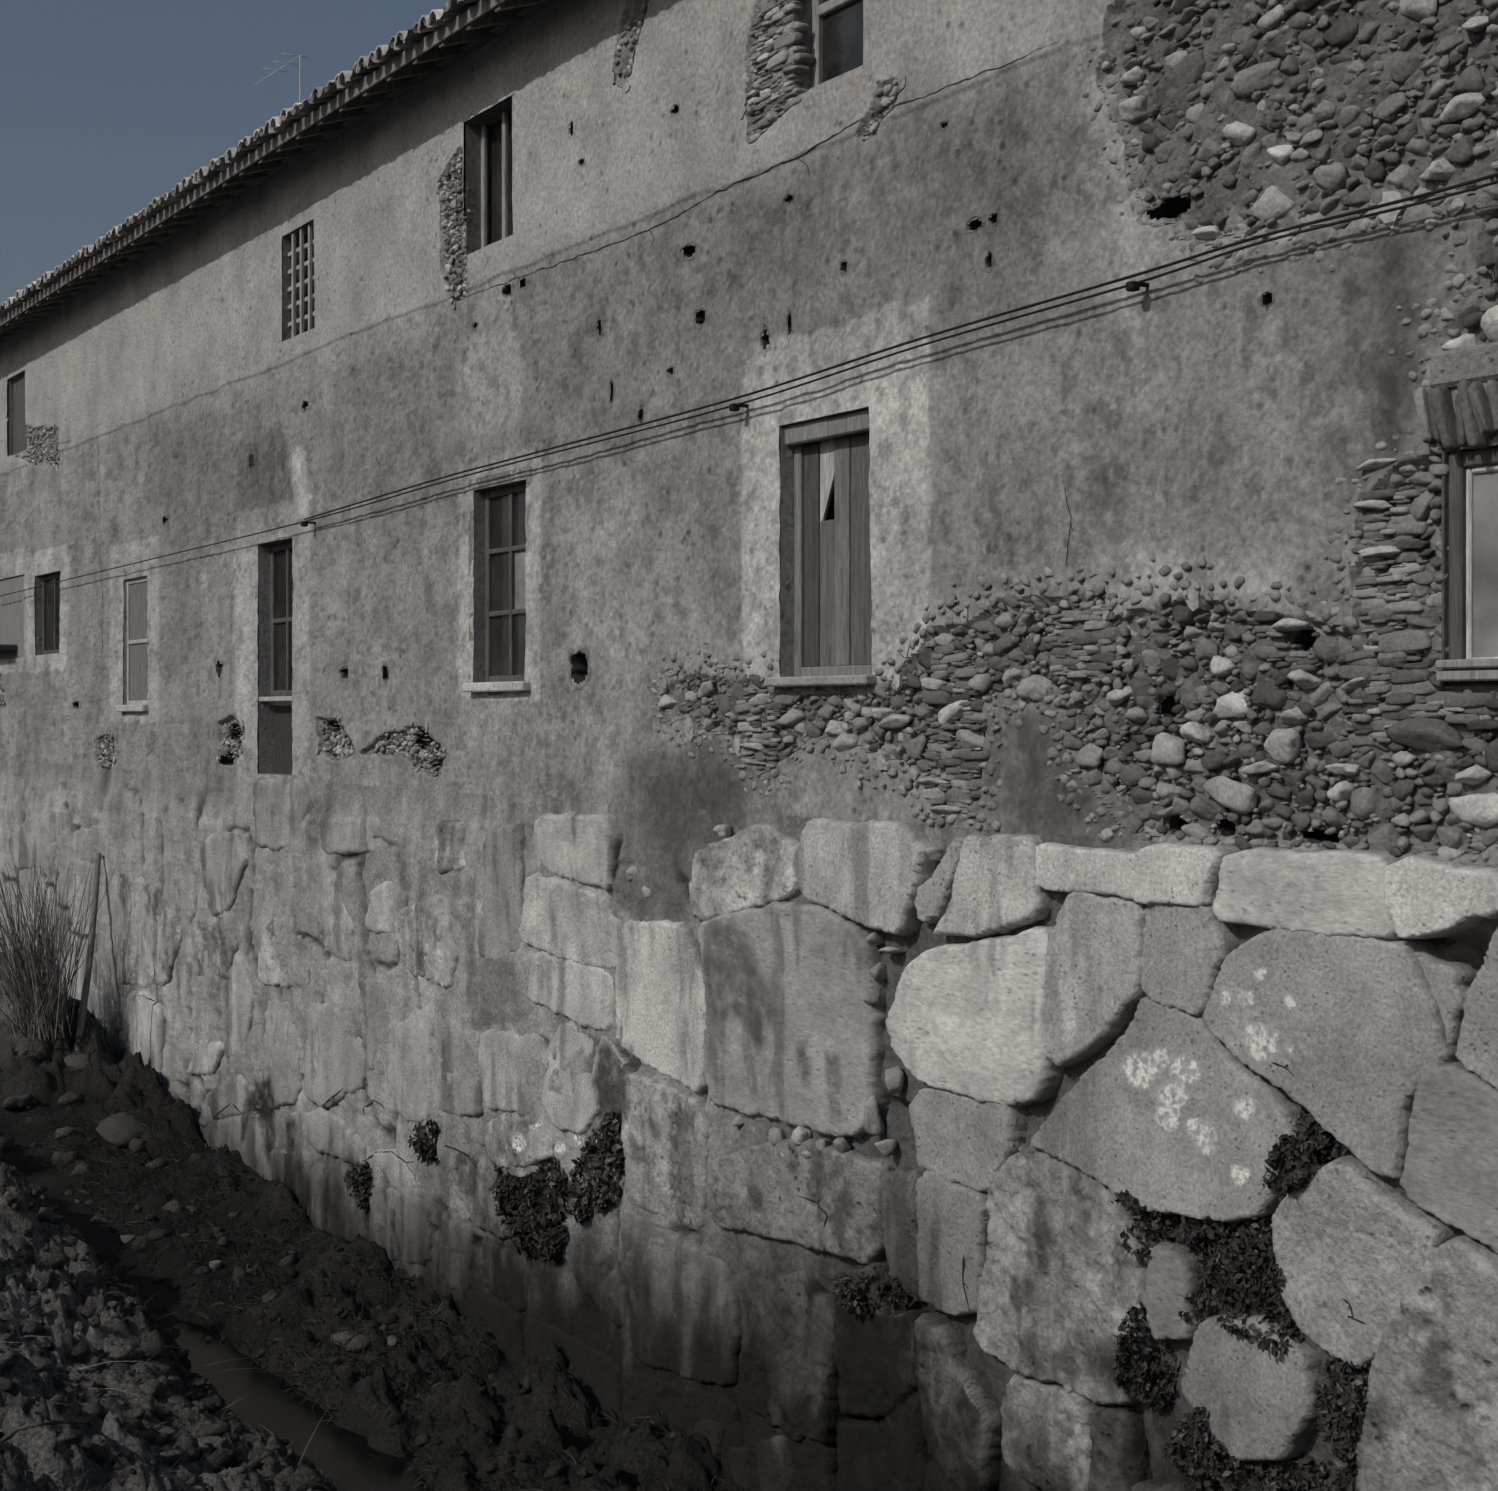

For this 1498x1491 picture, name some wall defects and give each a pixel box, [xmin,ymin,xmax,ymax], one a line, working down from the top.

spalling [609,0,648,92]
spalling [739,0,815,142]
spalling [855,73,906,144]
spalling [436,147,471,309]
spalling [1079,0,1498,387]
spalling [14,424,60,471]
spalling [646,422,1498,863]
spalling [216,715,245,766]
spalling [315,716,446,777]